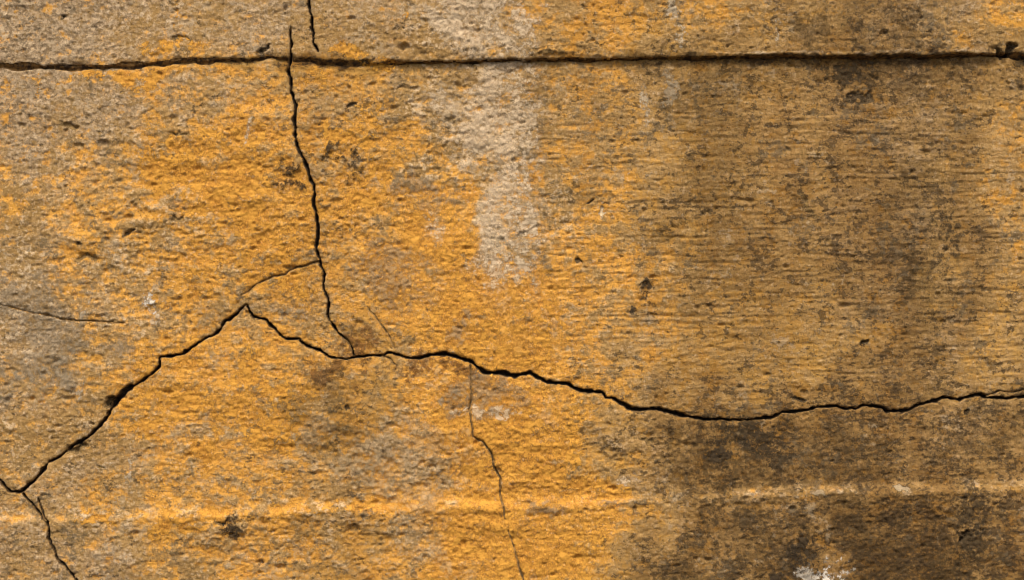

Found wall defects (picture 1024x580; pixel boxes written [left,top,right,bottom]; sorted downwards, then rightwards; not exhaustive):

crack [306,0,319,52]
damp [824,62,877,90]
crack [286,27,355,356]
damp [927,211,962,279]
crack [240,260,318,296]
damp [629,277,654,315]
crack [0,304,1024,580]
damp [703,416,794,469]
damp [954,479,988,569]
damp [769,533,856,580]